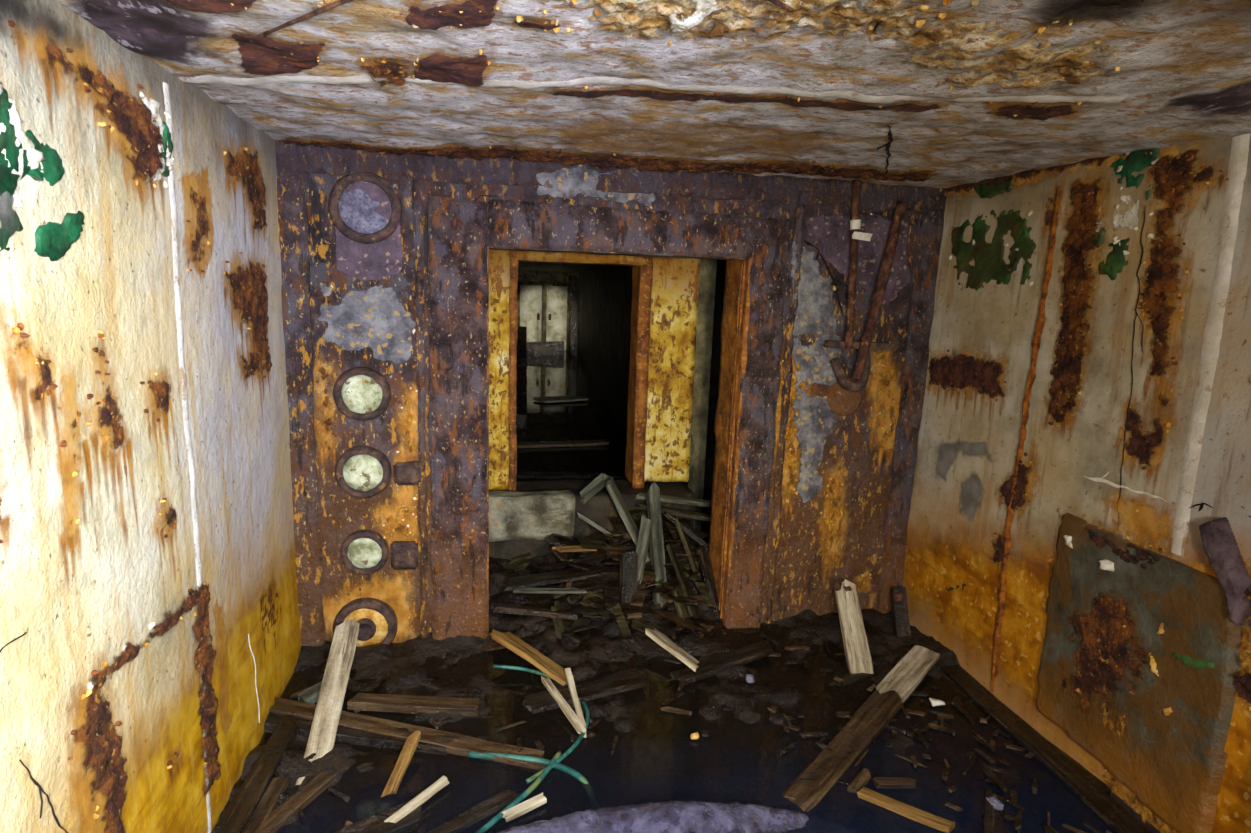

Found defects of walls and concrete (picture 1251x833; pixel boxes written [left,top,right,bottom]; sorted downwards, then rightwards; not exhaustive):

peeling [0,82,85,261]
rust [8,20,164,210]
rust [232,34,326,75]
spalling [263,0,353,36]
spalling [544,0,1136,90]
peeling [948,177,1036,291]
peeling [1093,148,1161,280]
rust [224,252,272,407]
rust [9,323,137,577]
rust [947,153,1129,692]
rust [68,582,232,833]
leakage [121,548,301,833]